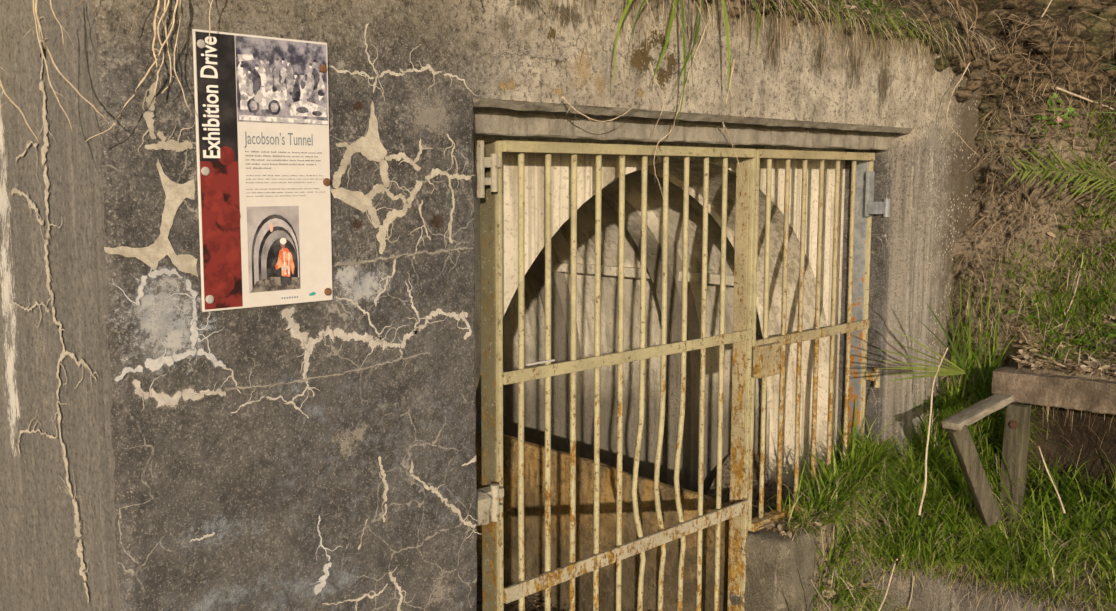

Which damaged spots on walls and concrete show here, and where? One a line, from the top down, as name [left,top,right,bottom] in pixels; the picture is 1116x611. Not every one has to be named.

leakage [0,85,21,455]
spalling [104,82,198,277]
crack [11,16,480,611]
spalling [330,96,475,254]